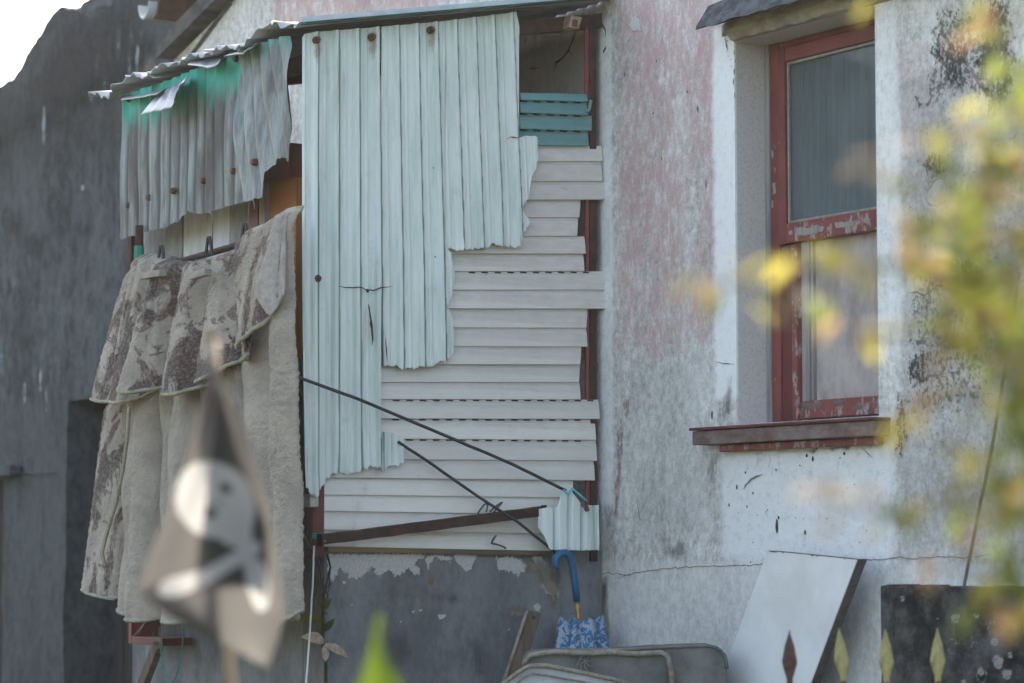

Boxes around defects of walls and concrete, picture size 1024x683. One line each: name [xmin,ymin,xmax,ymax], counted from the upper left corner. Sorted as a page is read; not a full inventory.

water stain [931,0,1014,117]
peeling [788,218,870,236]
crack [338,286,393,356]
peeling [327,552,477,584]
peeling [496,555,547,578]
crack [602,563,762,578]
crack [867,554,985,562]